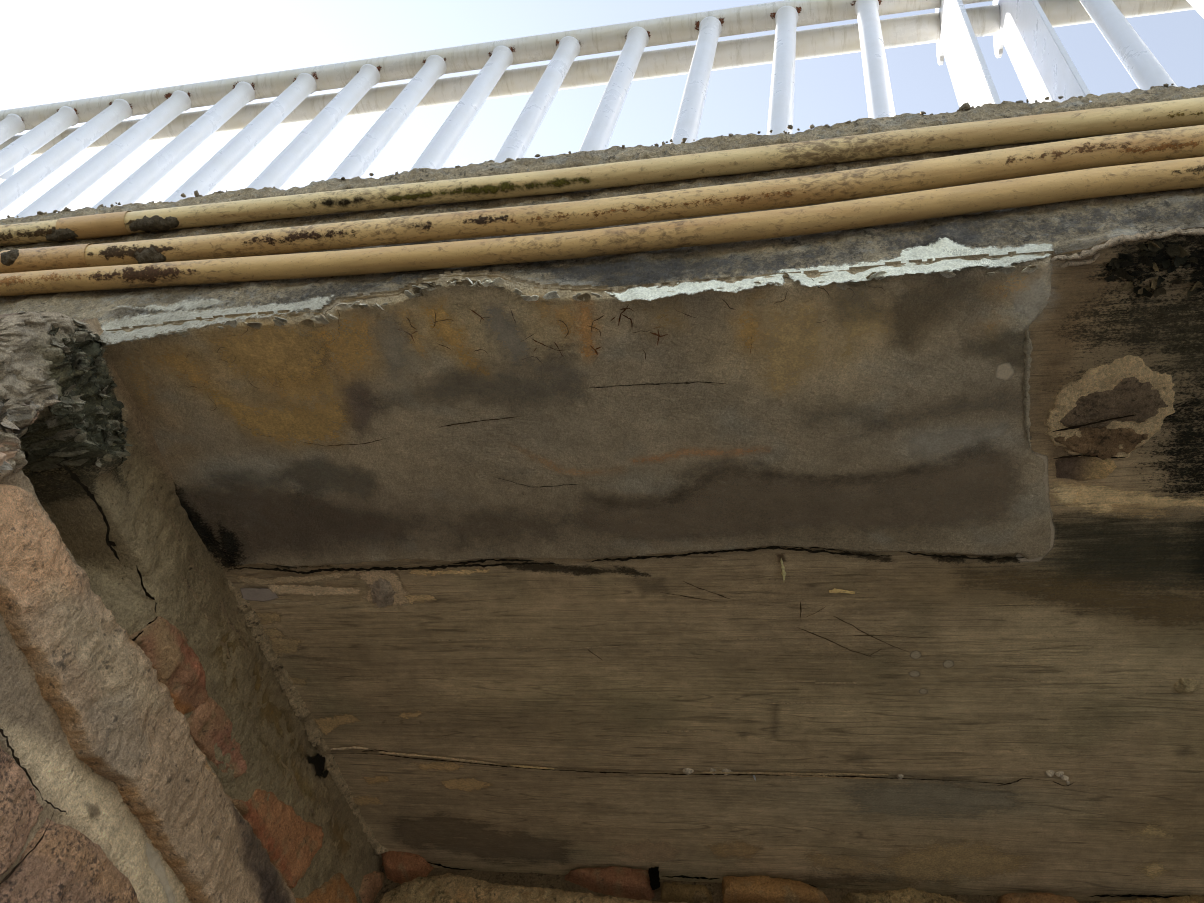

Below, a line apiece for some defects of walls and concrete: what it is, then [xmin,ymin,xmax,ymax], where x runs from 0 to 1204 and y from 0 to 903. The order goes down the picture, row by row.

rust [0,272,85,286]
peeling [0,318,133,480]
spalling [137,330,190,340]
spalling [218,301,388,329]
peeling [404,227,1204,302]
leakage [510,200,1204,501]
crack [63,464,157,641]
leakage [175,462,404,572]
crack [234,546,1024,578]
leakage [958,513,1204,630]
crack [0,728,67,884]
crack [330,749,1073,786]